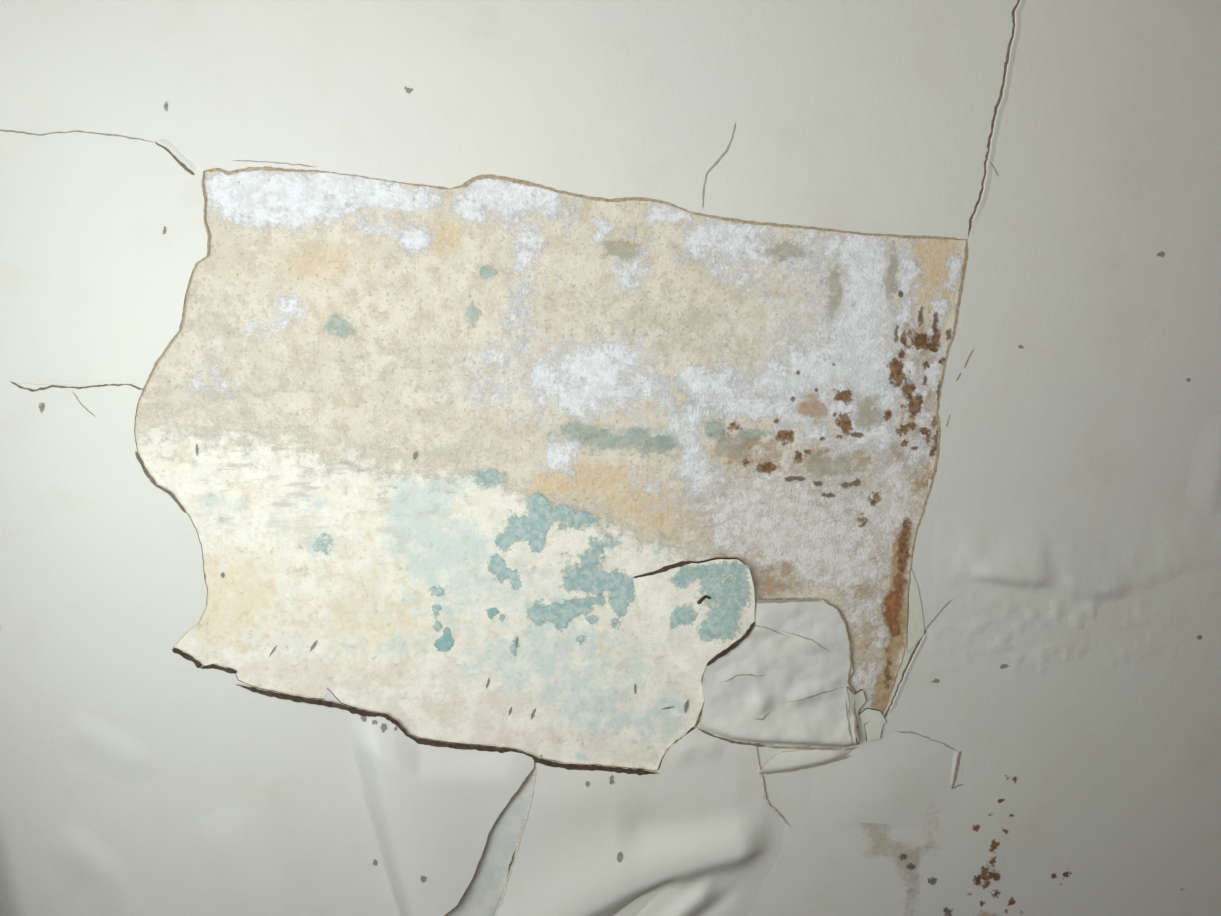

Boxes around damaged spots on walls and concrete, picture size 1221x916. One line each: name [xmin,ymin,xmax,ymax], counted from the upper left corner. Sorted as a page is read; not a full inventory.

crack [0,130,196,175]
crack [235,159,312,167]
crack [968,0,1027,236]
peeling [134,166,968,776]
leakage [203,169,964,714]
rust [727,388,863,498]
rust [884,307,951,457]
rust [871,518,911,711]
rust [968,799,1015,915]